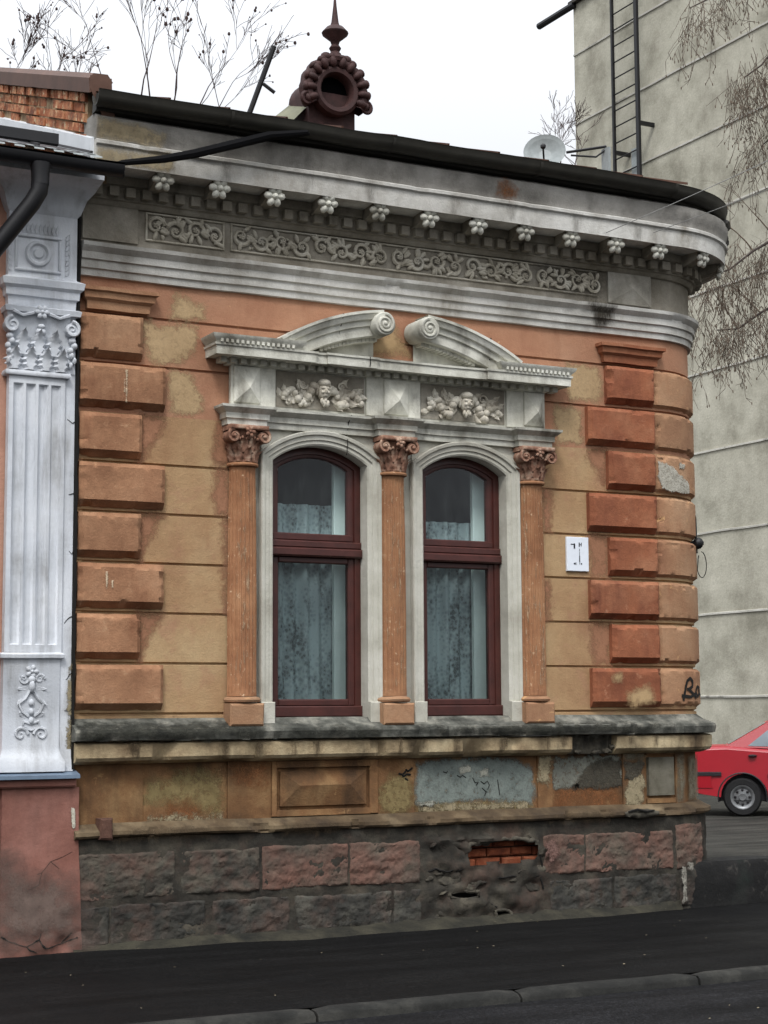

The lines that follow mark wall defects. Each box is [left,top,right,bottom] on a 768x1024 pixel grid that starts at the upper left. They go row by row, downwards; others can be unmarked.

spalling [658,461,690,494]
flaking render [379,757,536,814]
peeling [552,754,647,805]
spalling [425,832,559,917]
crack [1,933,78,953]